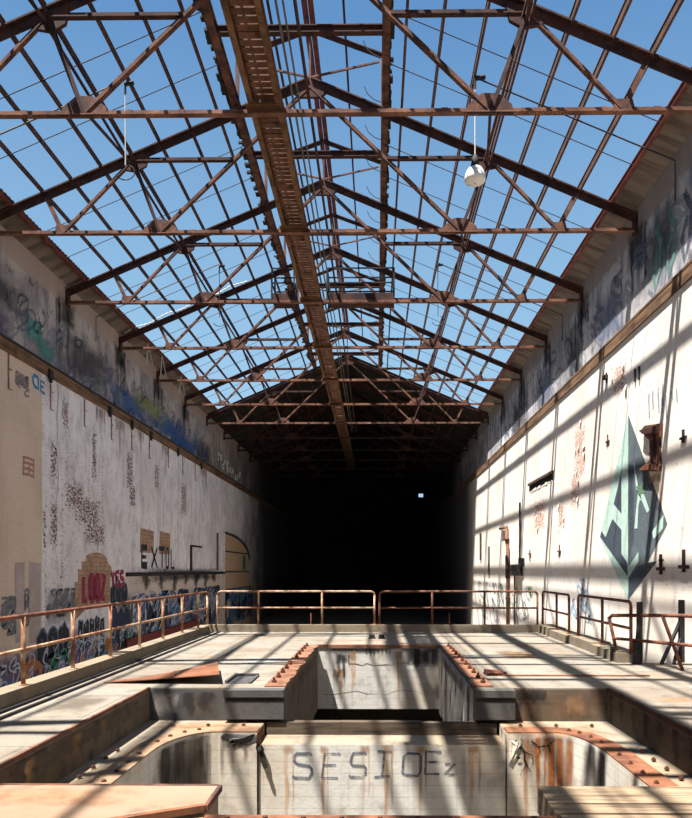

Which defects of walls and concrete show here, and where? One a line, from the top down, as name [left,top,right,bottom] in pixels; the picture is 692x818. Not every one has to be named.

peeling [43,441,106,551]
peeling [557,419,586,532]
damp [337,654,349,677]
rust [535,738,572,786]